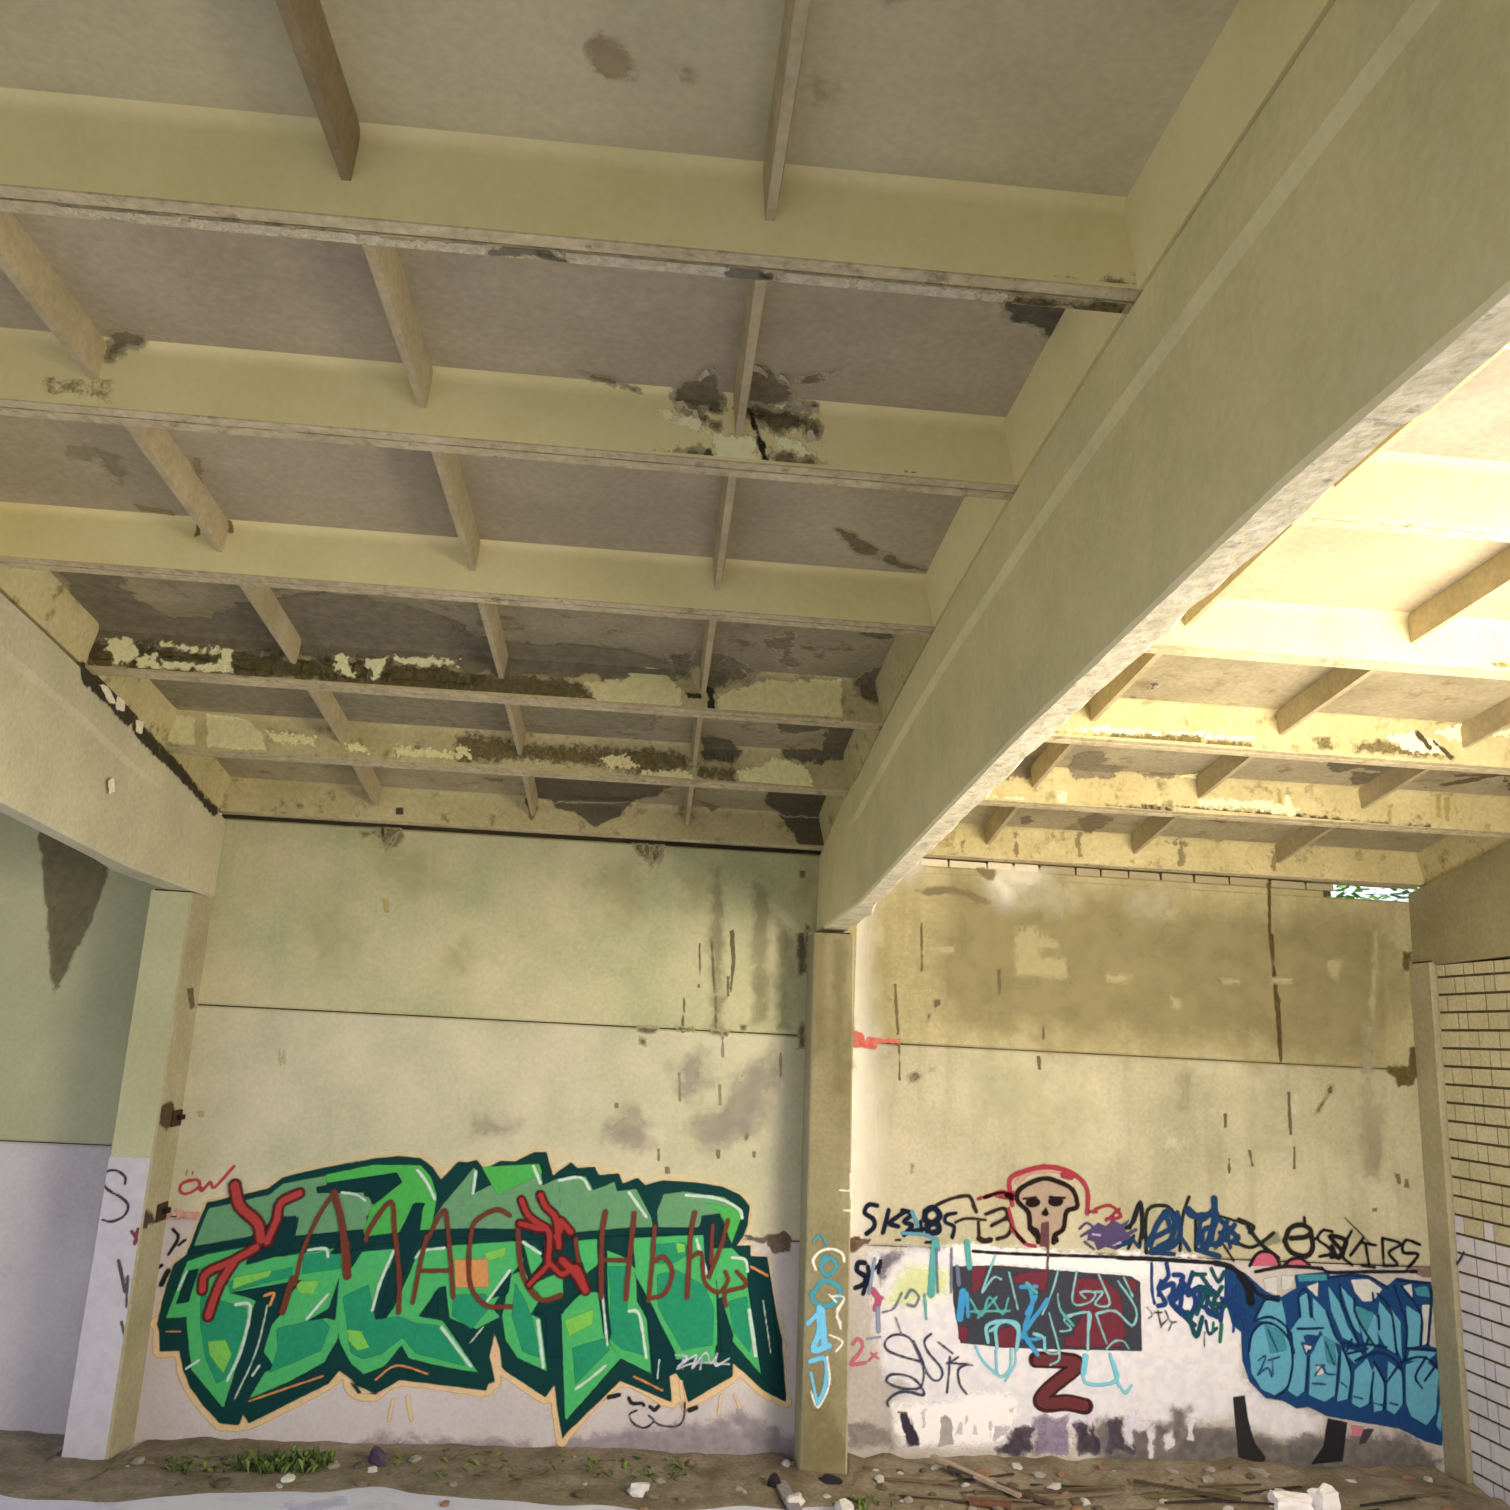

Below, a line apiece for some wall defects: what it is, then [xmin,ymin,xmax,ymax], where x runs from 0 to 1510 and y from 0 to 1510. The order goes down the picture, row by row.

leakage [585,36,631,78]
spalling [575,369,642,394]
spalling [654,364,844,465]
spalling [857,631,897,644]
spalling [80,628,882,816]
spalling [391,730,827,846]
spalling [1054,723,1257,747]
spalling [1312,724,1462,761]
leakage [38,832,107,989]
leakage [709,874,724,1030]
leakage [752,891,789,1028]
rust [159,1101,175,1131]